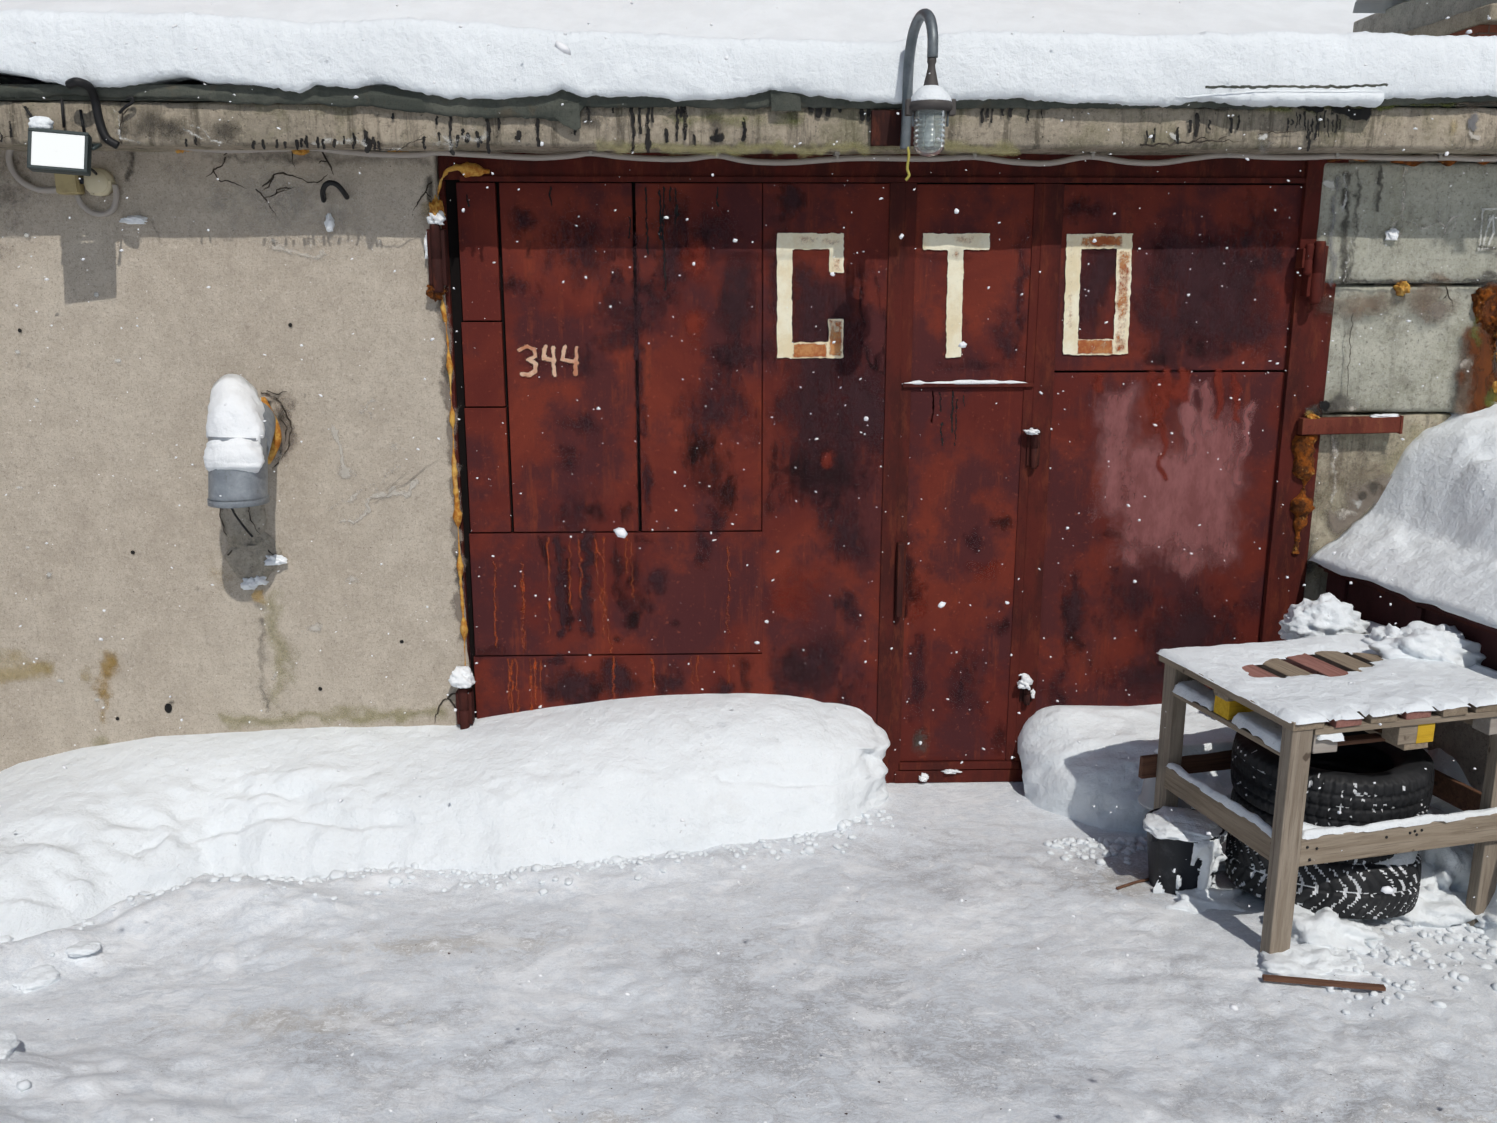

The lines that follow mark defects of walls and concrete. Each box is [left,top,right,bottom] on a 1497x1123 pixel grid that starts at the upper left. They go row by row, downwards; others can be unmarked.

damp [422,116,541,154]
damp [638,106,725,153]
damp [808,107,871,122]
damp [986,108,1043,123]
corrosion [1078,211,1281,433]
corrosion [1455,278,1497,414]
corrosion [766,235,885,559]
corrosion [493,535,699,713]
corrosion [720,657,747,694]
corrosion [772,637,861,706]